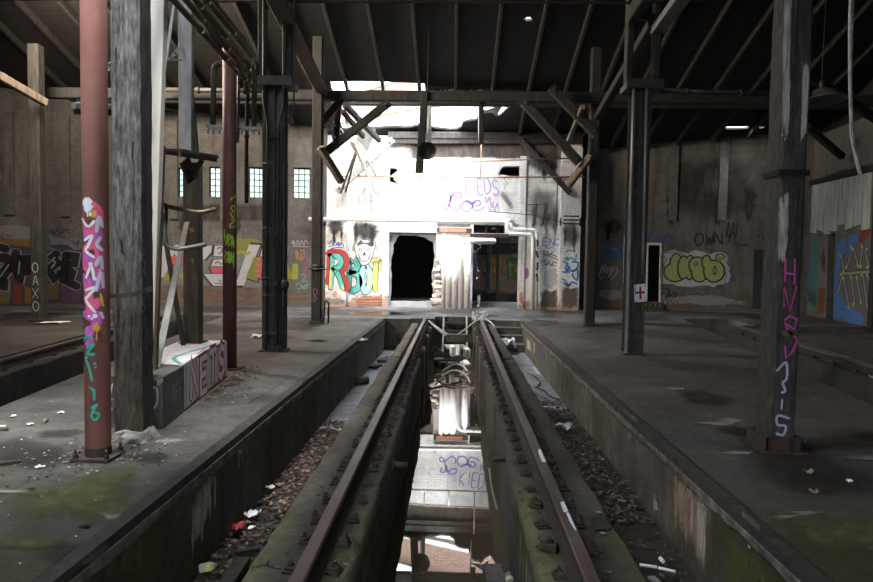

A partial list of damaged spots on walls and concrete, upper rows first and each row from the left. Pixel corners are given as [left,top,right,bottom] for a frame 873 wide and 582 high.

leakage [191,475,216,551]
leakage [691,499,706,564]